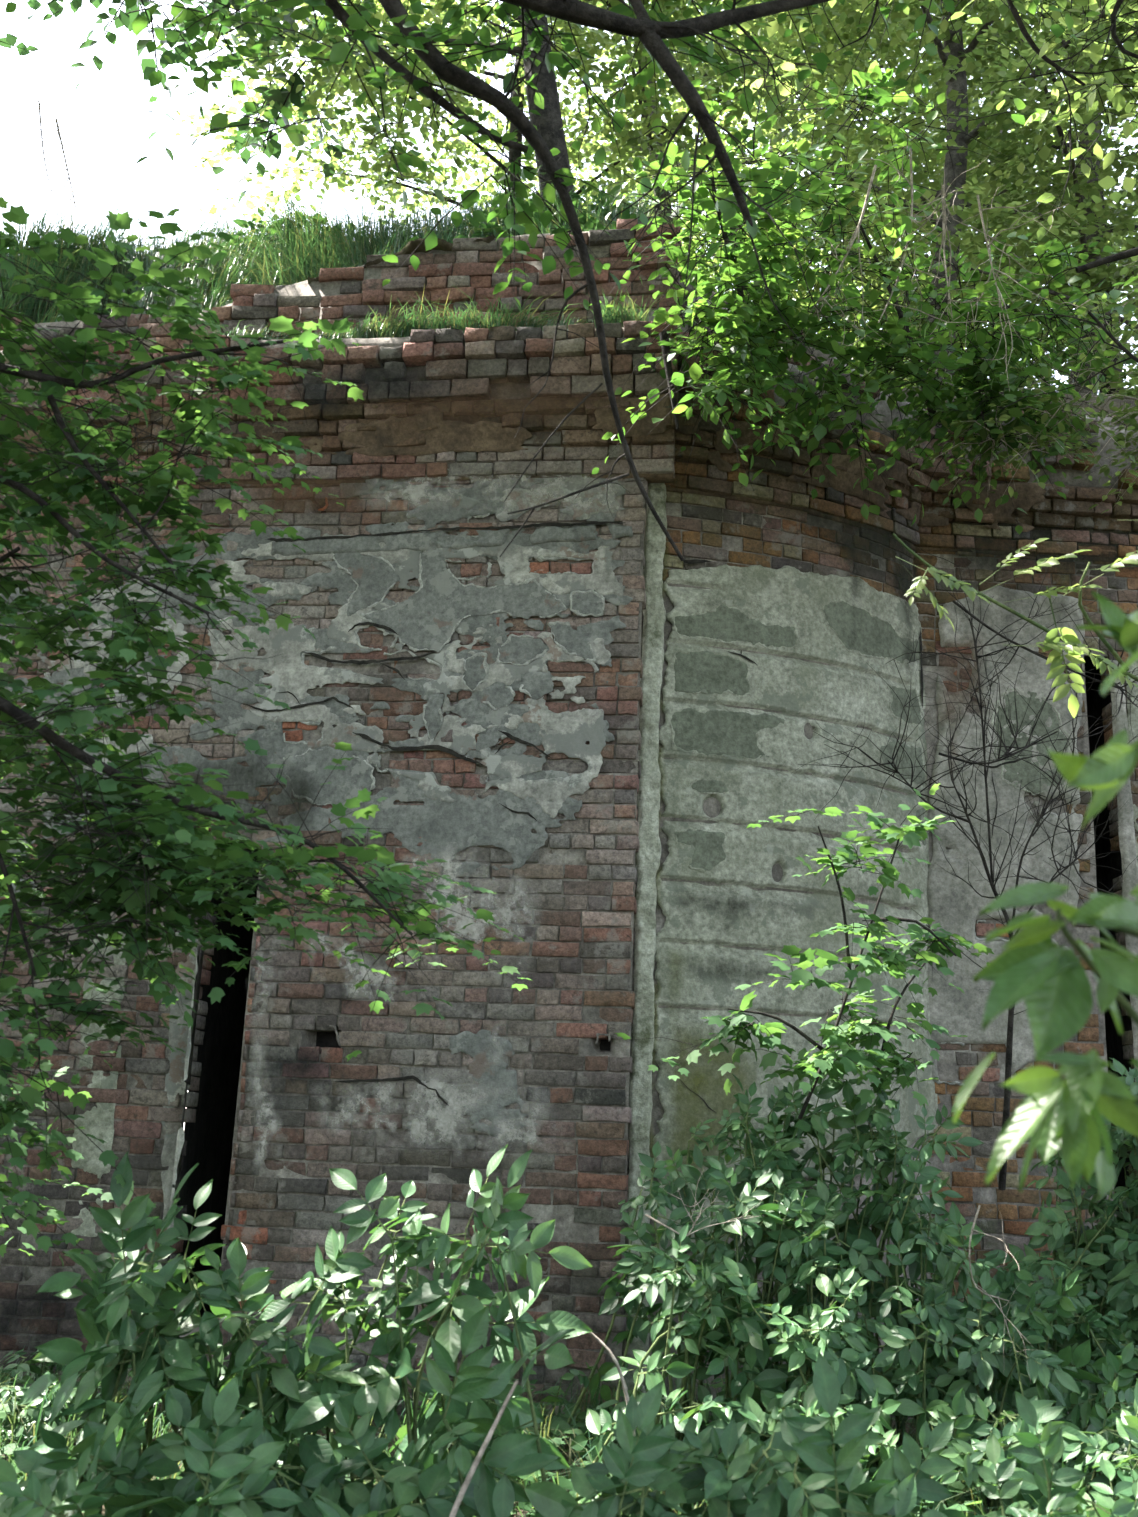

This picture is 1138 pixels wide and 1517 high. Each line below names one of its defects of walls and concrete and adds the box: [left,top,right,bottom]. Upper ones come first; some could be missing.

flaking render [459,513,505,537]
flaking render [354,548,605,710]
flaking render [282,720,499,808]